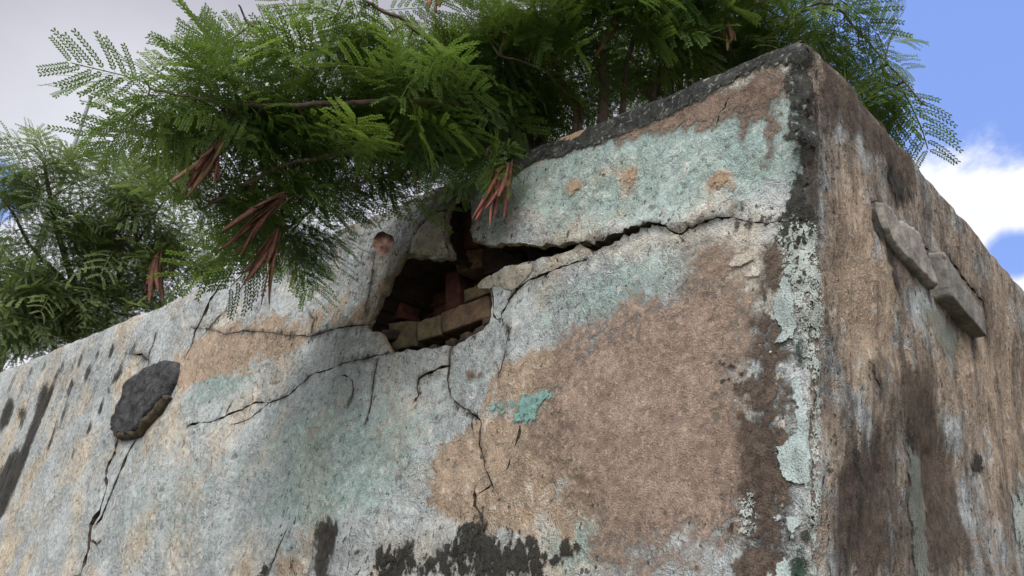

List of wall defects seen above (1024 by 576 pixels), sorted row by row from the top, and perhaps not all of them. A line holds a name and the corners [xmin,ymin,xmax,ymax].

crack [182,255,375,363]
spalling [372,231,394,256]
flaking render [389,207,560,352]
crack [490,216,783,376]
leakage [0,339,137,516]
crack [75,438,135,576]
crack [188,352,389,426]
leakage [308,516,338,576]
crack [412,346,521,533]
leakage [370,516,581,576]
leakage [834,362,972,576]
leakage [971,450,985,477]